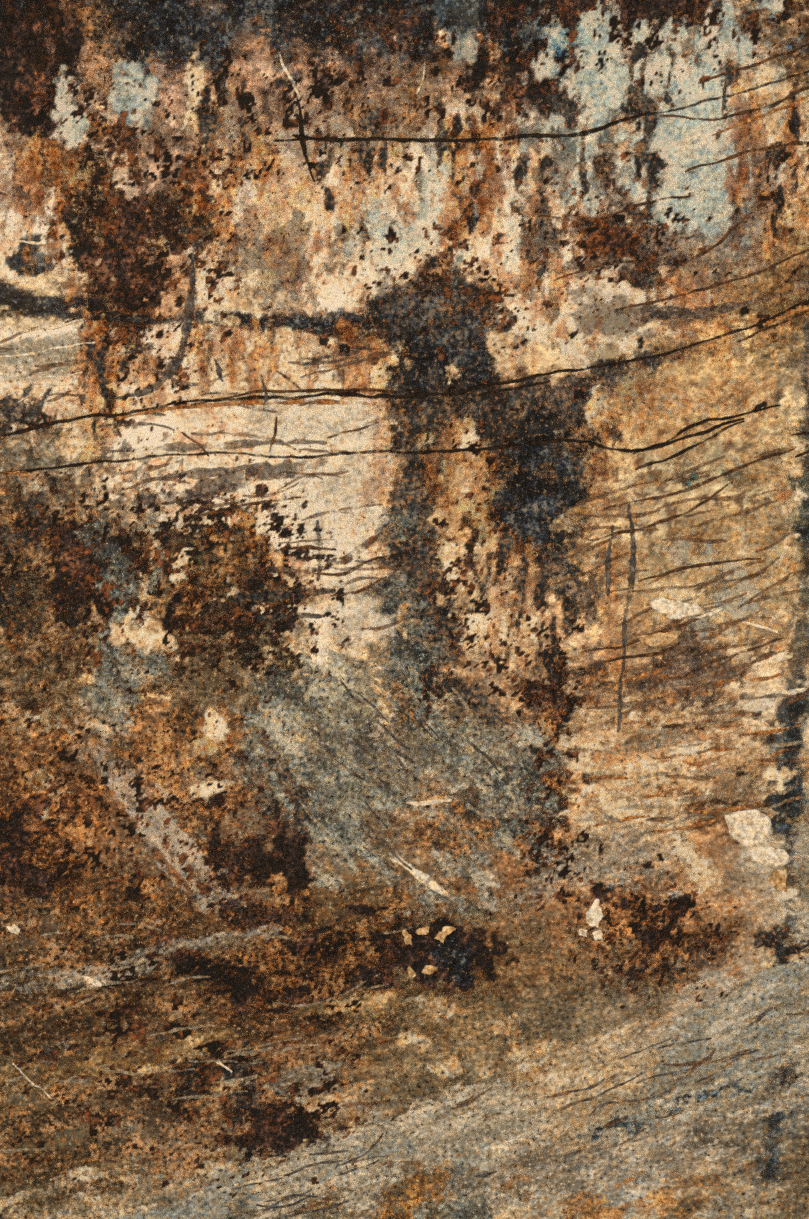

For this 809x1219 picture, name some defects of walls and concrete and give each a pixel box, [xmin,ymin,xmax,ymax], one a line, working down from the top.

damp [0,231,391,342]
rust [0,0,401,446]
crack [614,248,809,311]
crack [0,300,809,833]
rust [328,0,809,1008]
rust [0,456,484,1219]
crack [275,673,523,872]
crack [0,923,160,988]
crack [5,976,318,1105]
crack [375,985,427,1002]
crack [210,1005,809,1217]
rust [562,1177,721,1219]